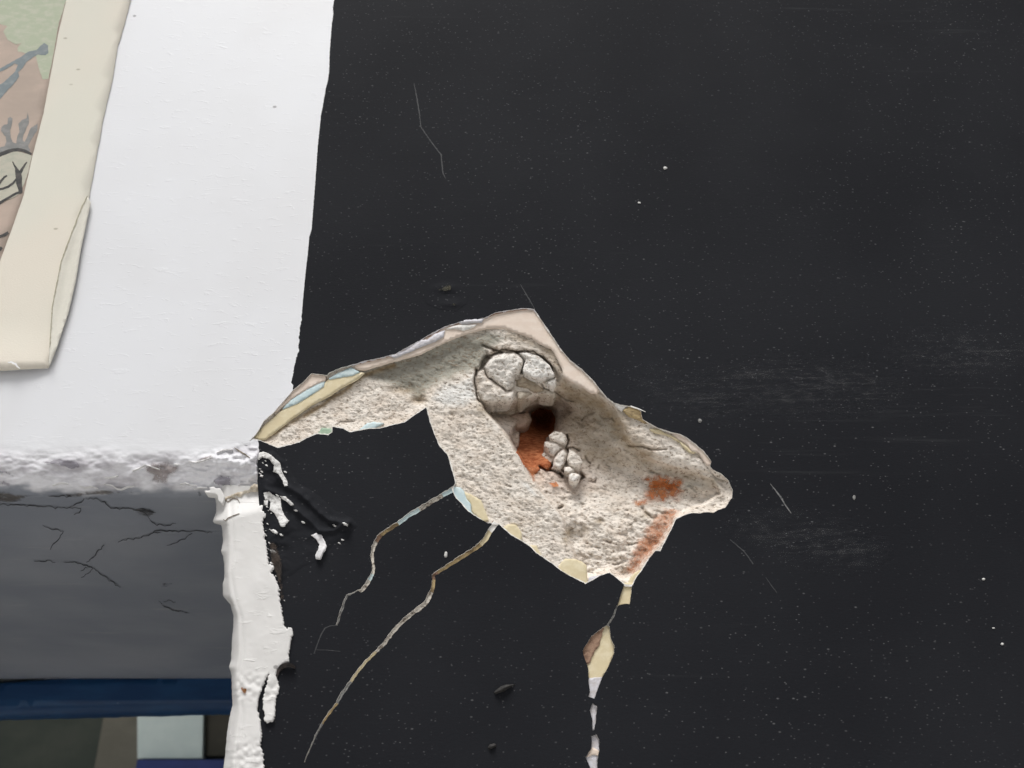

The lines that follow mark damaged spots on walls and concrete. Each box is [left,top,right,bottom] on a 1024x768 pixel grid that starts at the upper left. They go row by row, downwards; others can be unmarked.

damp [45,459,79,469]
crack [1,495,212,588]
damp [146,463,177,482]
damp [214,476,230,485]
crack [314,487,457,653]
flaking render [174,308,732,587]
rust [628,475,682,571]
crack [305,521,498,761]